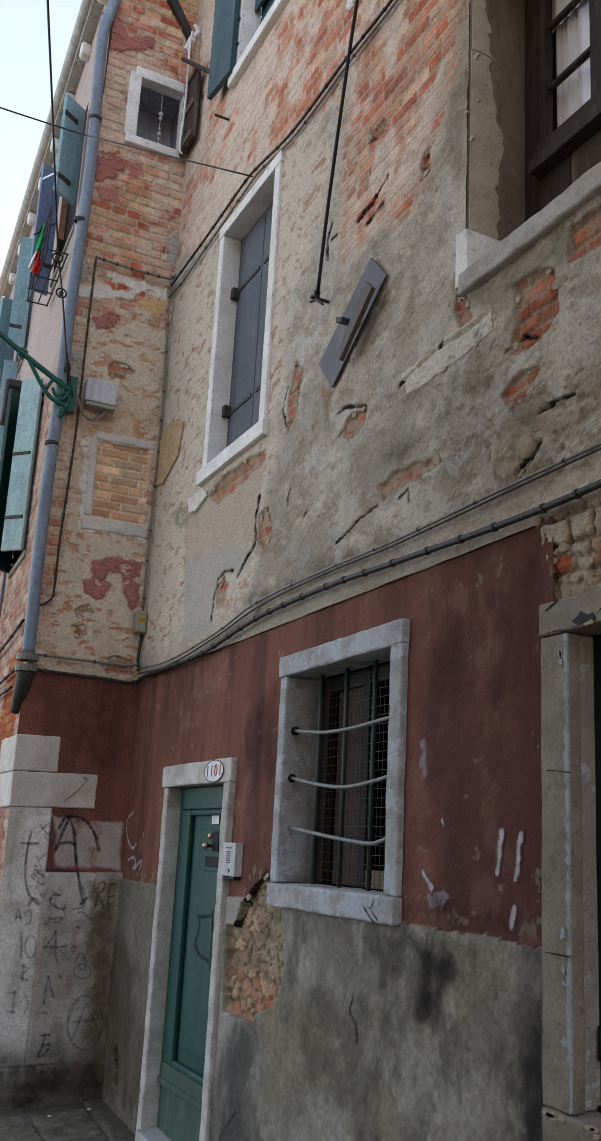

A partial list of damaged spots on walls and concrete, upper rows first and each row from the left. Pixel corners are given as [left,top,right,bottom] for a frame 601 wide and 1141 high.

peeling [469,0,504,240]
spalling [419,147,431,180]
spalling [565,207,601,263]
spalling [510,268,561,354]
spalling [286,361,303,431]
crack [338,404,367,414]
spalling [502,366,538,407]
crack [210,487,307,621]
spalling [225,873,284,1023]
water stain [416,951,454,1021]
crack [349,1000,358,1044]
water stain [521,1053,539,1141]